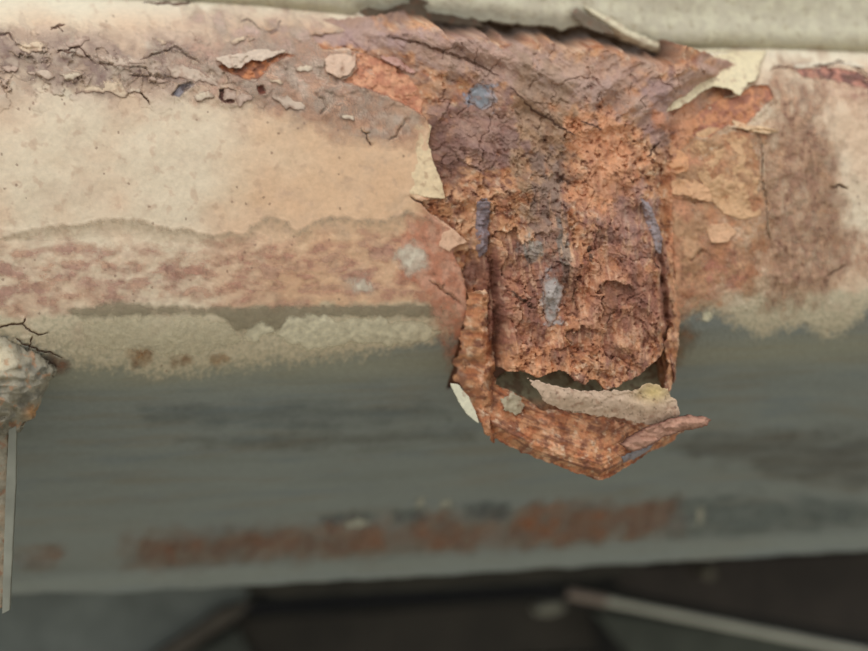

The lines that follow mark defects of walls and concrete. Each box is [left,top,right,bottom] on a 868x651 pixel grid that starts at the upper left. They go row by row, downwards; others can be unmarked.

peeling [359,0,483,28]
peeling [570,6,660,54]
peeling [1,48,146,98]
peeling [145,34,306,110]
spalling [325,48,445,199]
peeling [667,48,778,243]
crack [732,128,778,245]
corrosion [664,68,868,310]
peeling [433,215,467,252]
corrosion [0,207,467,356]
crack [0,318,61,358]
peeling [500,391,525,416]